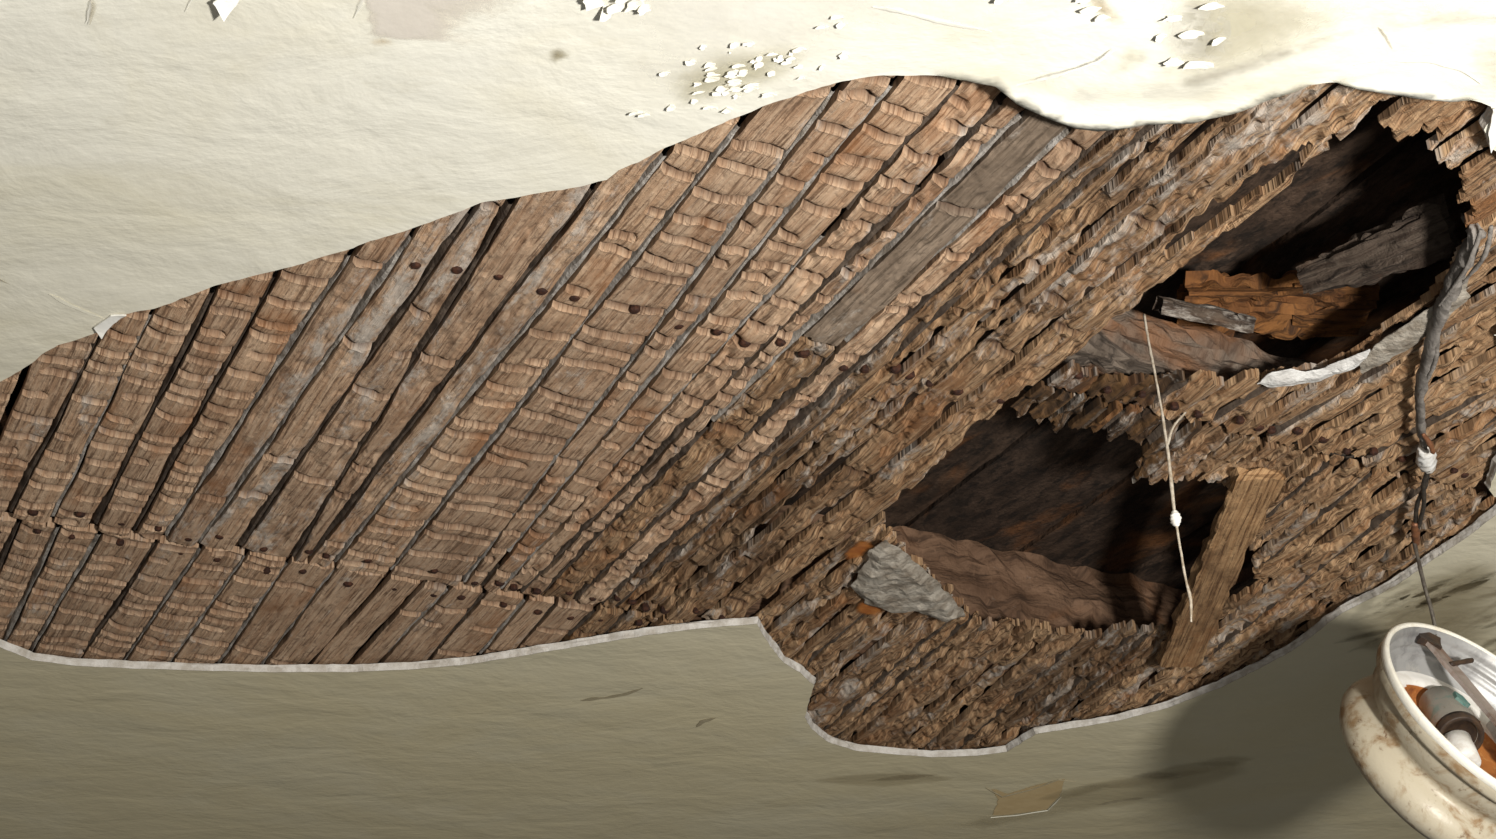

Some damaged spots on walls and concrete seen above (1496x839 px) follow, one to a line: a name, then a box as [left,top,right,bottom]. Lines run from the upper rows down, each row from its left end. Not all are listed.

peeling [213,0,239,21]
peeling [354,0,481,39]
peeling [629,42,849,118]
spalling [1479,106,1496,153]
spalling [94,314,126,339]
spalling [0,455,1496,757]